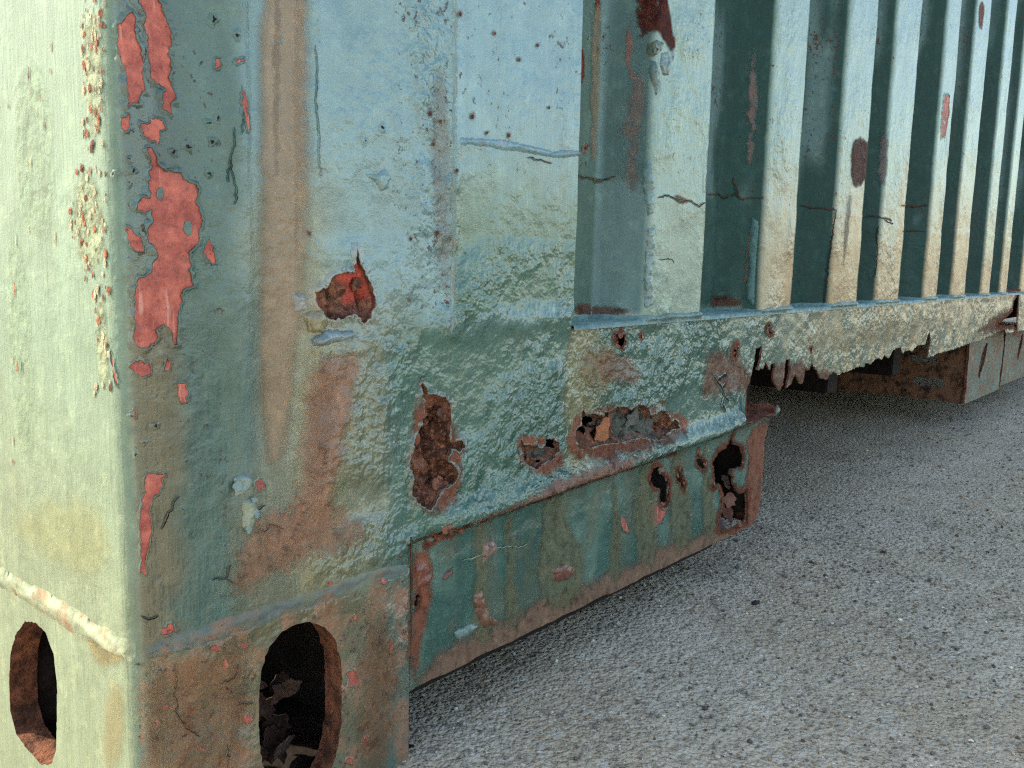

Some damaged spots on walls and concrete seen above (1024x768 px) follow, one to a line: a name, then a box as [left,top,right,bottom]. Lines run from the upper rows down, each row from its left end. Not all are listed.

corrosion [637,0,675,58]
peeling [68,0,218,405]
corrosion [852,137,888,187]
peeling [136,470,170,578]
corrosion [408,412,770,684]